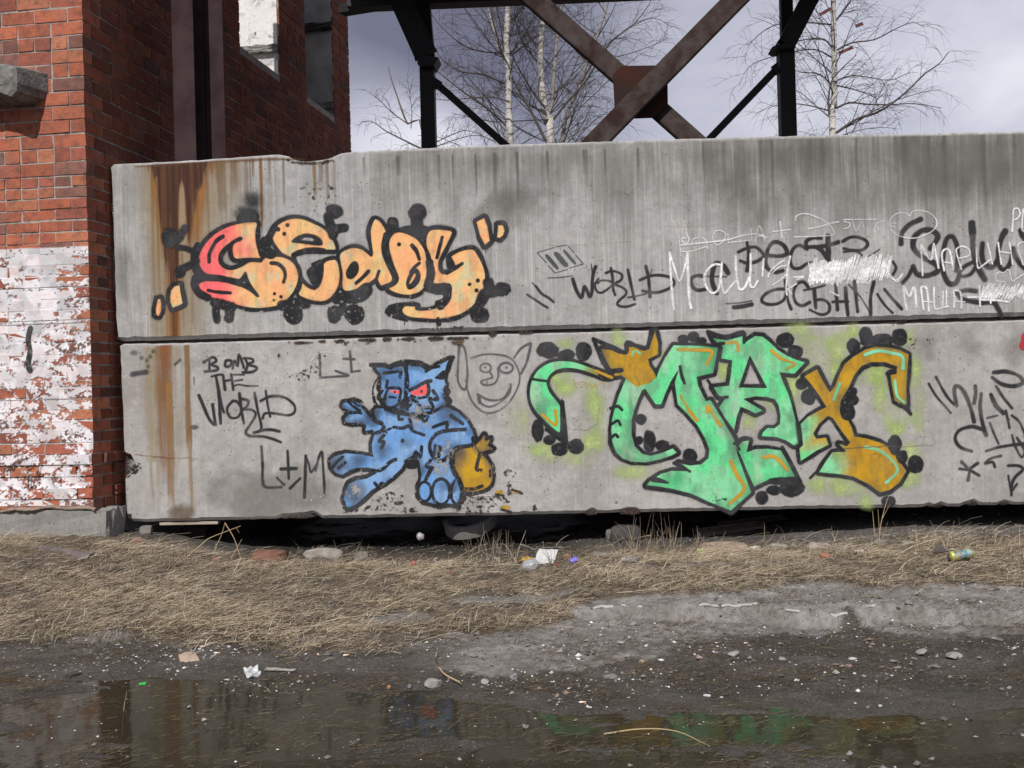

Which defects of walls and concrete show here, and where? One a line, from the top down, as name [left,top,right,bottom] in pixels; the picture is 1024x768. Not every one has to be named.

peeling [0,246,93,506]
rust [147,158,292,484]